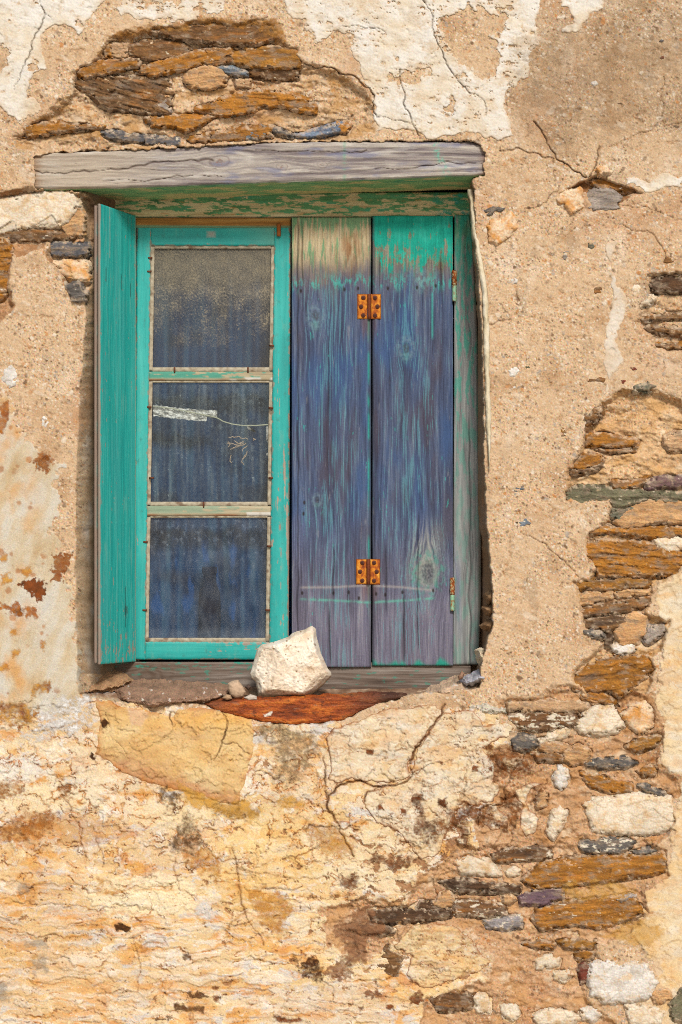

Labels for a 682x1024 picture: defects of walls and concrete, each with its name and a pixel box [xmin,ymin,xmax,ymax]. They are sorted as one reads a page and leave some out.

spalling [0,0,541,155]
spalling [559,165,682,210]
spalling [318,272,682,1024]
crack [308,706,444,857]